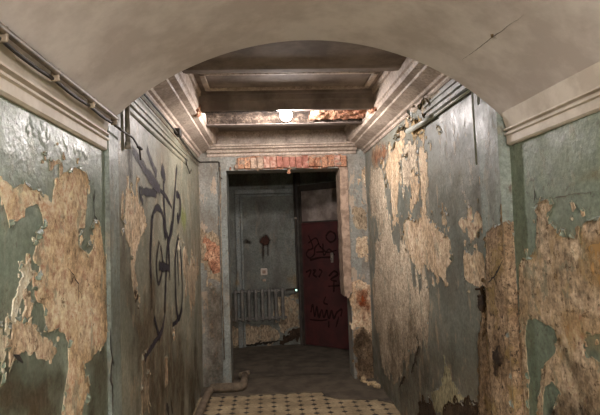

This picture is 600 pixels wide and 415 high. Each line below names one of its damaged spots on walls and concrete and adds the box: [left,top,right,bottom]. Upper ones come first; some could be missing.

spalling [194,104,377,125]
peeling [0,151,109,415]
peeling [121,175,147,309]
spalling [178,228,221,318]
peeling [232,292,300,347]
peeling [349,90,453,386]
peeling [417,196,600,415]